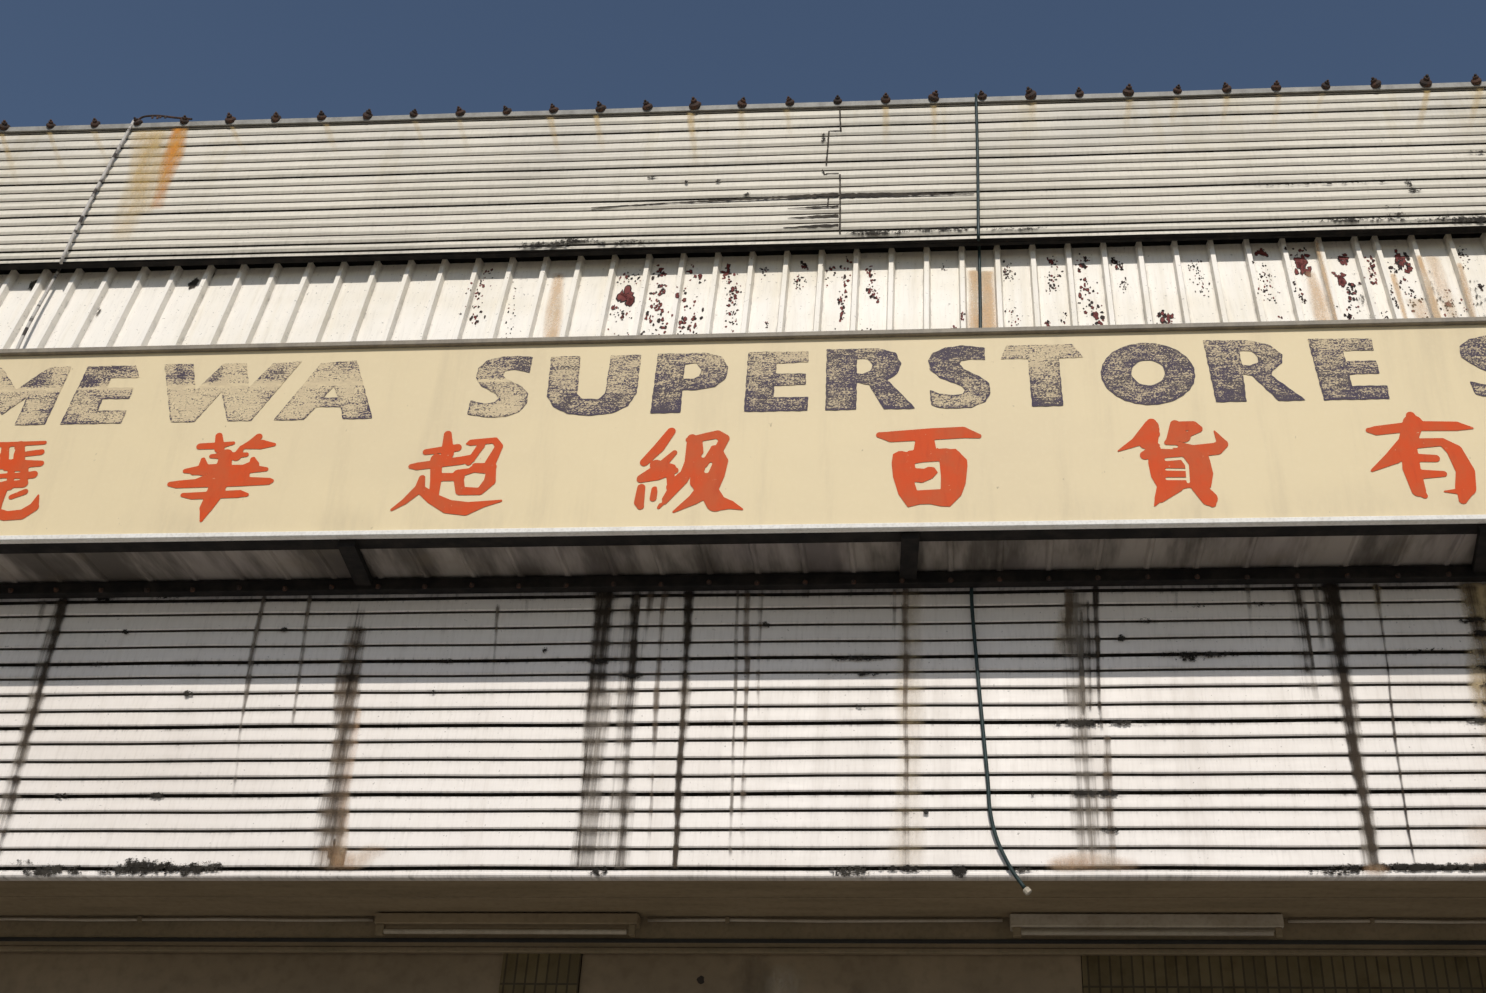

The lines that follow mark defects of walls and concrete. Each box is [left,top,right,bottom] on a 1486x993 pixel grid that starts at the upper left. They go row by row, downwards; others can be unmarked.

corrosion [152,129,185,186]
corrosion [1313,243,1332,320]
damp [0,598,68,837]
damp [318,611,364,854]
damp [575,591,694,877]
damp [1056,586,1147,851]
damp [1159,651,1239,662]
damp [1293,583,1486,875]